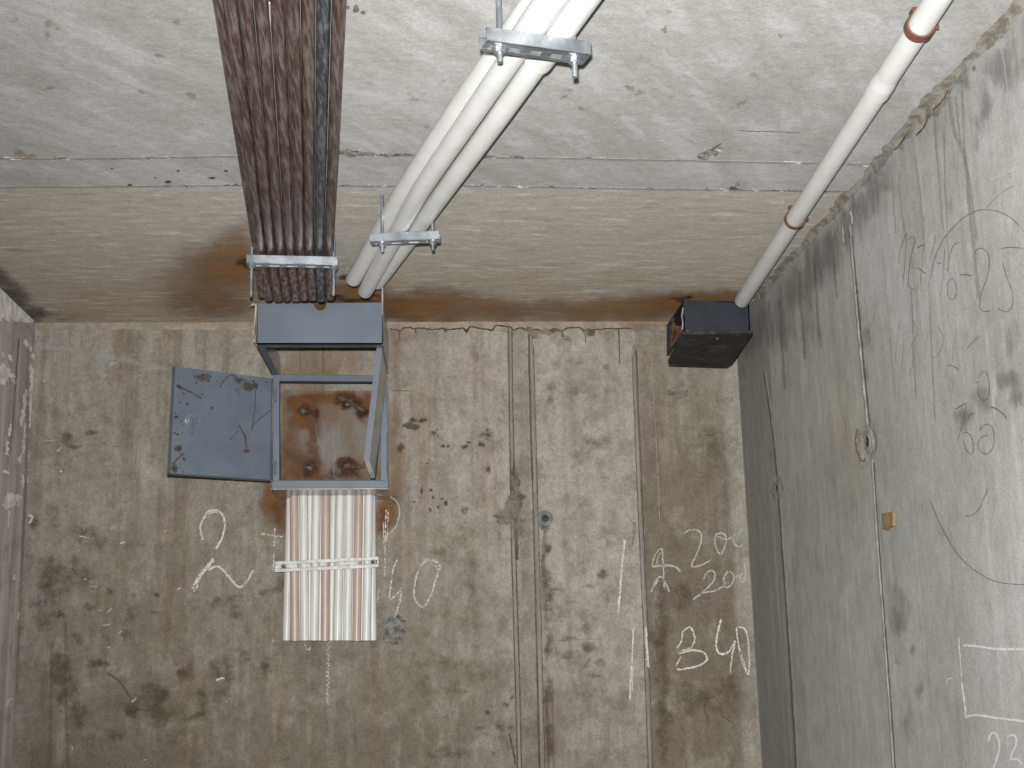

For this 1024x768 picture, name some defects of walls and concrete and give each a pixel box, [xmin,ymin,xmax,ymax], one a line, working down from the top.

rust [183,239,255,312]
rust [314,275,736,322]
crack [391,325,632,363]
peeling [0,339,45,528]
rust [263,483,286,532]